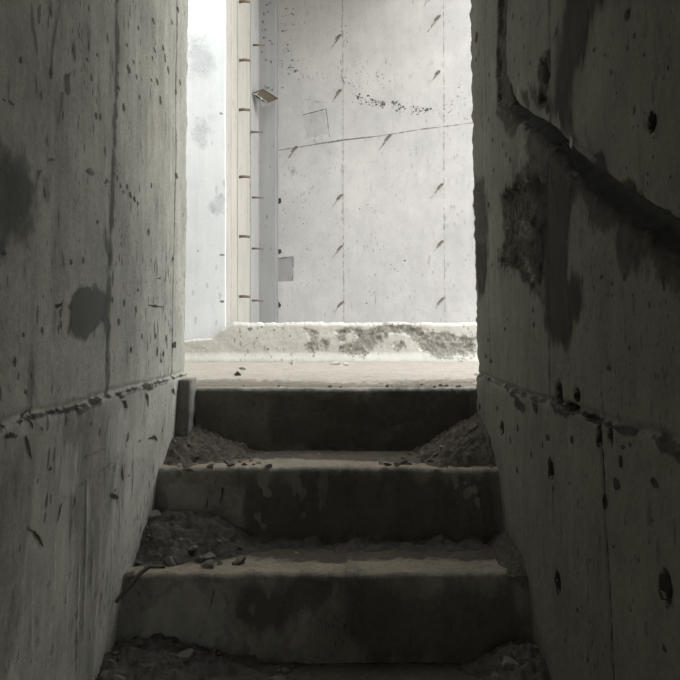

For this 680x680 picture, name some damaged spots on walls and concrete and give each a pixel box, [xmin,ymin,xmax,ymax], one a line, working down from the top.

water stain [0,155,31,246]
water stain [496,107,680,350]
water stain [68,285,110,340]